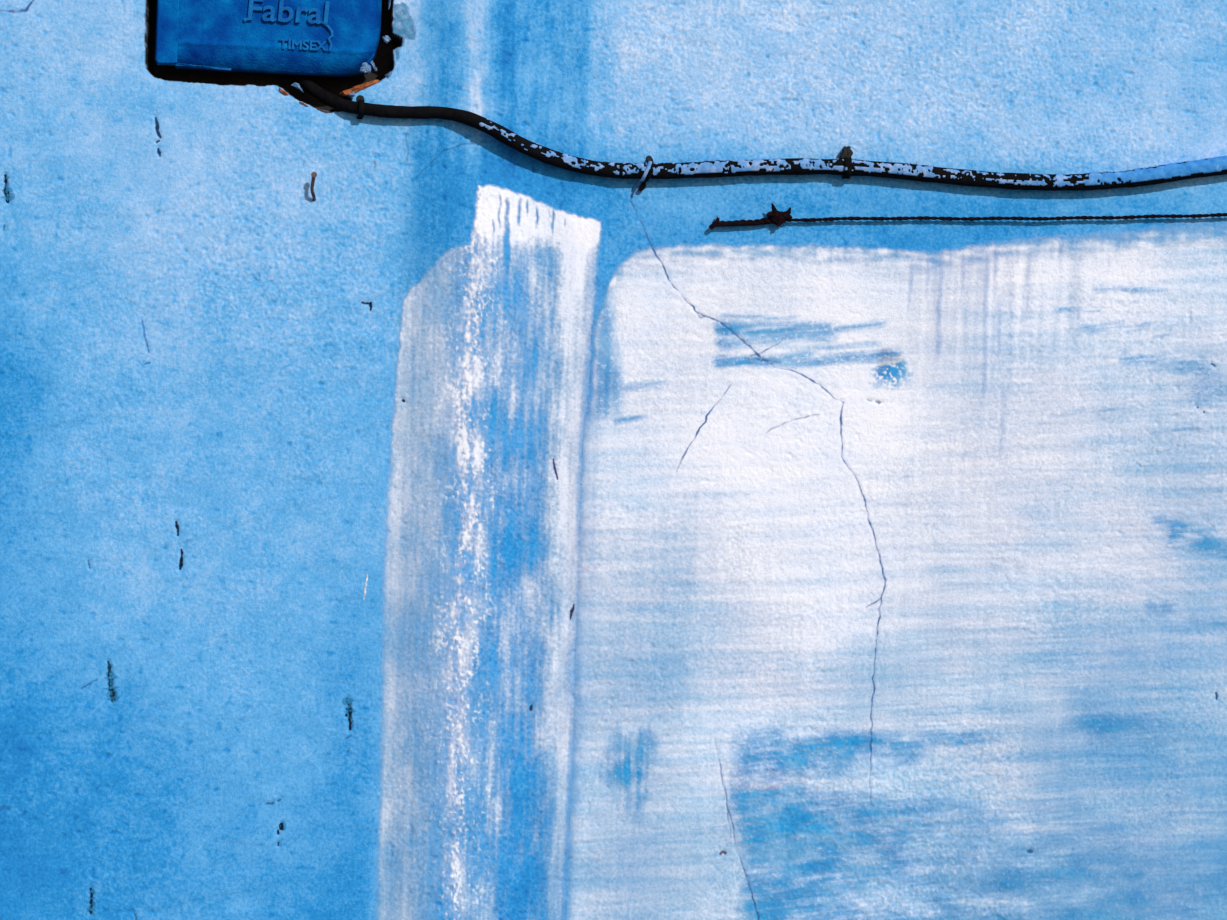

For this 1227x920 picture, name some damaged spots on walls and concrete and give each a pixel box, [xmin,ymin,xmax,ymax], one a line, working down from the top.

crack [630,201,886,760]